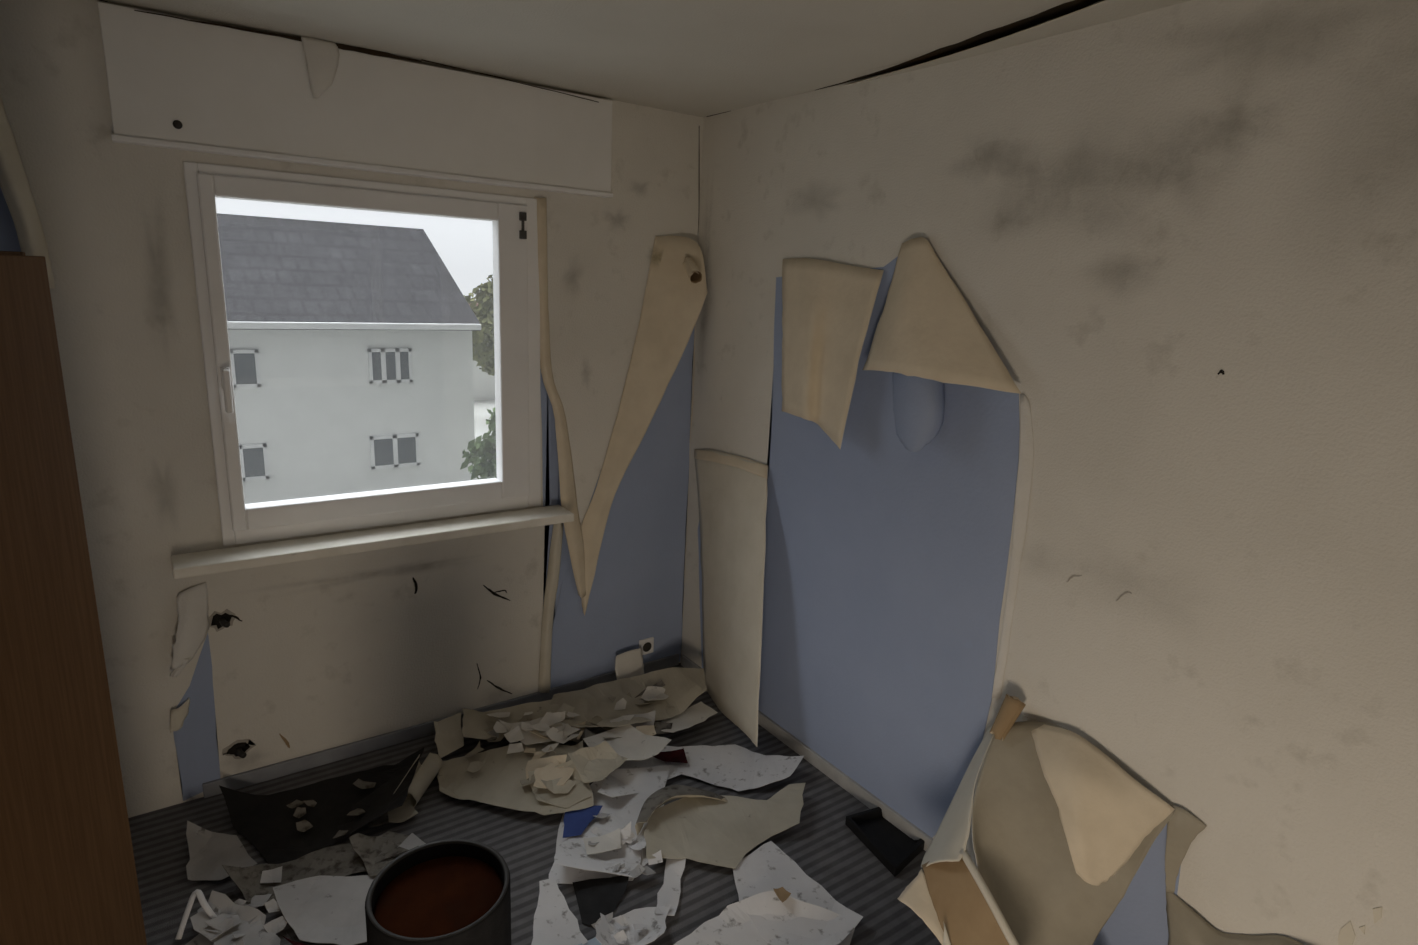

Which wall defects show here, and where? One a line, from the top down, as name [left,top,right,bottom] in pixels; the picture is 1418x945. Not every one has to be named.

crack [817,0,1191,90]
peeling [0,187,21,252]
peeling [540,326,704,688]
peeling [758,257,1020,838]
peeling [1093,824,1181,945]